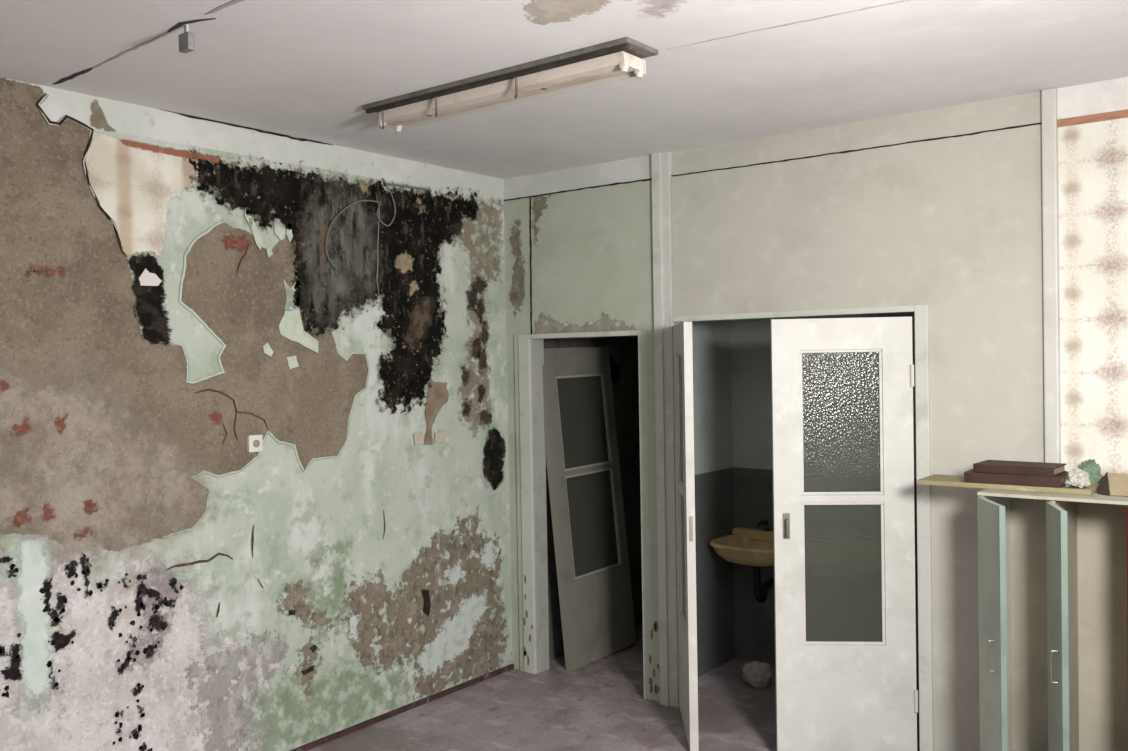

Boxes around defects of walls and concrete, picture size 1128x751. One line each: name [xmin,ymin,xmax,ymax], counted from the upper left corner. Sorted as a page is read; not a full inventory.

flaking render [0,77,533,751]
damp [189,149,551,490]
peeling [534,312,635,338]